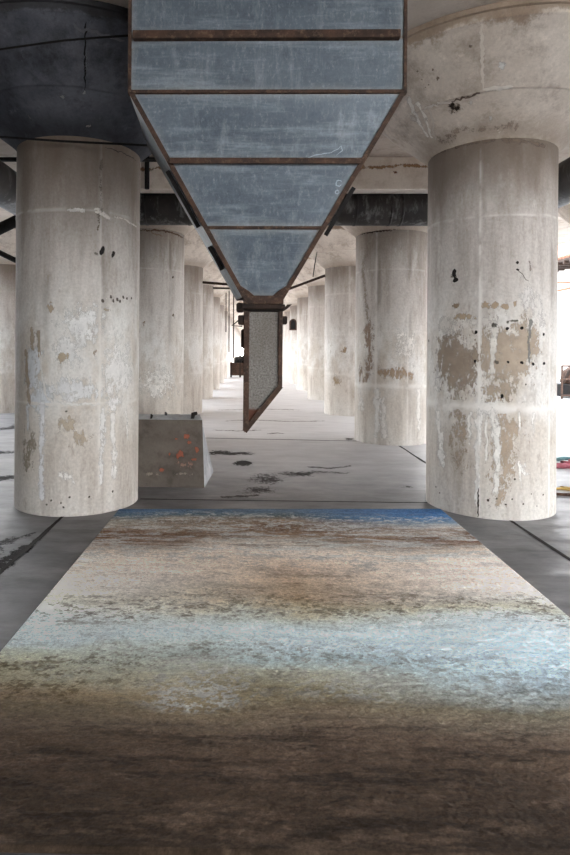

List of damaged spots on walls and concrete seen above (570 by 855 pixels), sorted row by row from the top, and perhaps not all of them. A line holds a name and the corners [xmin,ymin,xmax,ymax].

crack [81,23,89,94]
crack [422,92,480,140]
peeling [24,327,41,405]
peeling [433,300,544,403]
damp [236,465,351,496]